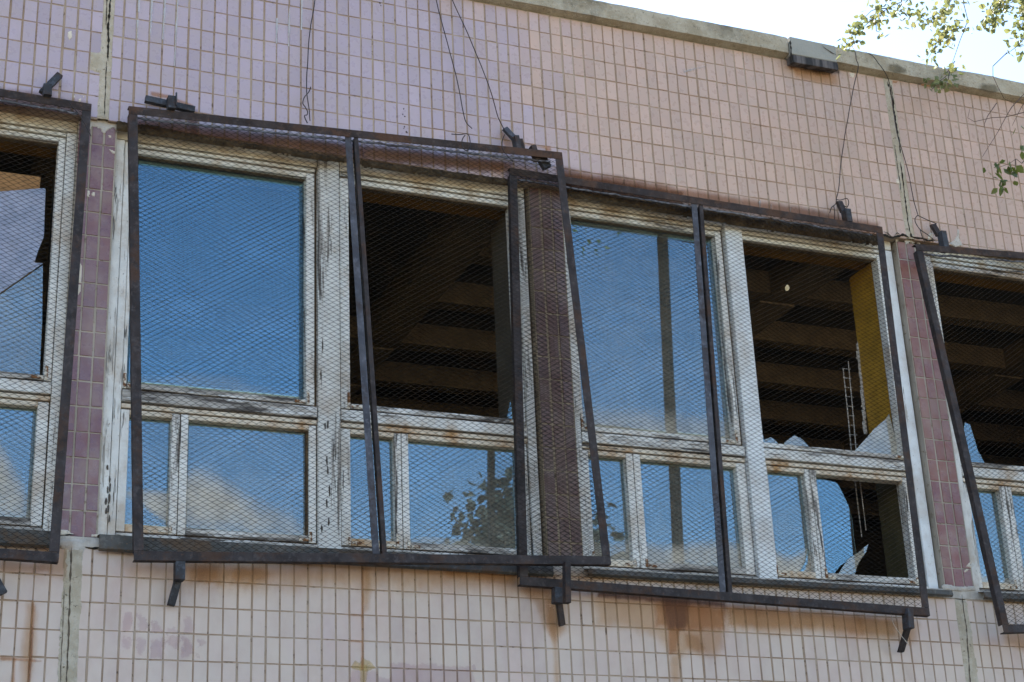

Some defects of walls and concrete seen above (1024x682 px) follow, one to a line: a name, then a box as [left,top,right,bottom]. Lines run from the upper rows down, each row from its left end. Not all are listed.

crack [103,0,111,115]
crack [883,81,934,241]